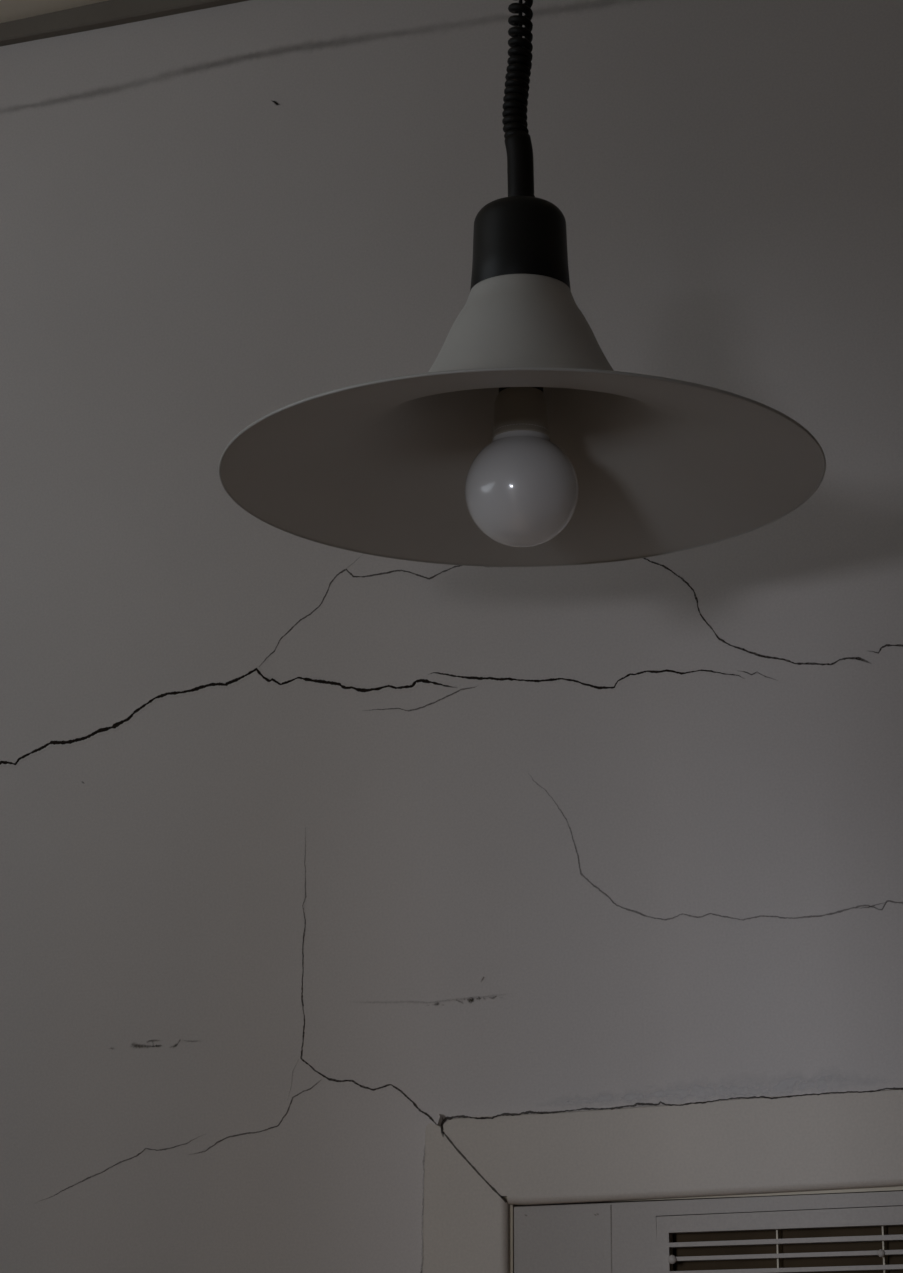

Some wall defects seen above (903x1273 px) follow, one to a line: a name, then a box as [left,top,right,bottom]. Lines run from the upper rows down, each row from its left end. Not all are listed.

crack [0,558,903,768]
crack [49,893,903,1203]